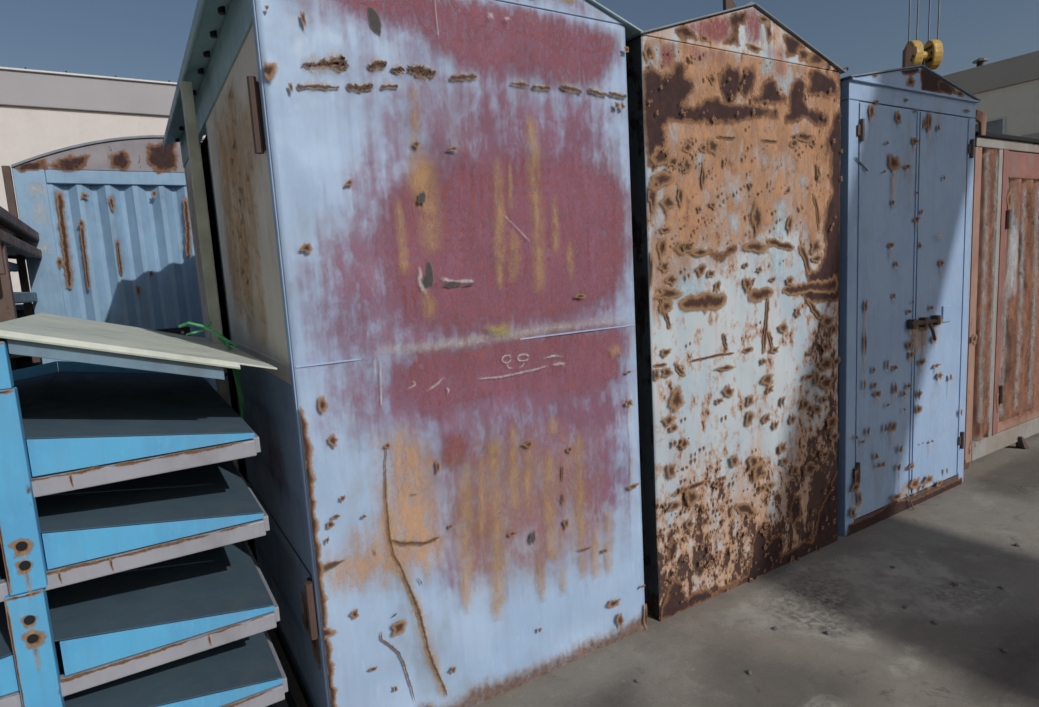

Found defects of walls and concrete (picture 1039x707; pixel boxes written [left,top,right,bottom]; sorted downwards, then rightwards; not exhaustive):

corrosion [263,62,278,81]
corrosion [16,154,90,172]
corrosion [110,151,131,171]
corrosion [146,143,178,174]
corrosion [56,191,90,290]
corrosion [183,192,200,259]
corrosion [643,10,970,621]
corrosion [972,149,1039,439]
corrosion [318,396,328,413]
corrosion [300,406,440,707]
corrosion [450,599,648,707]